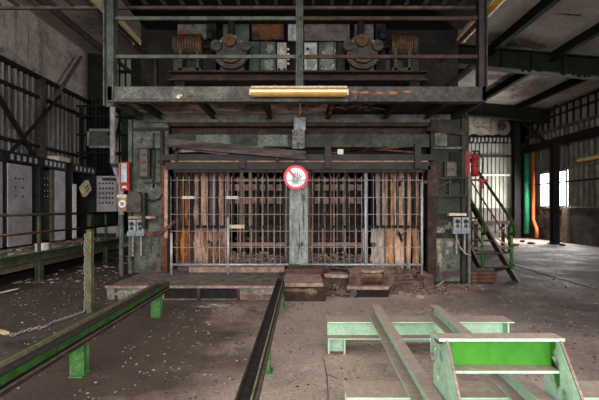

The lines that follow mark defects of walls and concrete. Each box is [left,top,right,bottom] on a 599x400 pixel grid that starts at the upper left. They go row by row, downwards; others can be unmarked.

peeling [436,222,454,268]